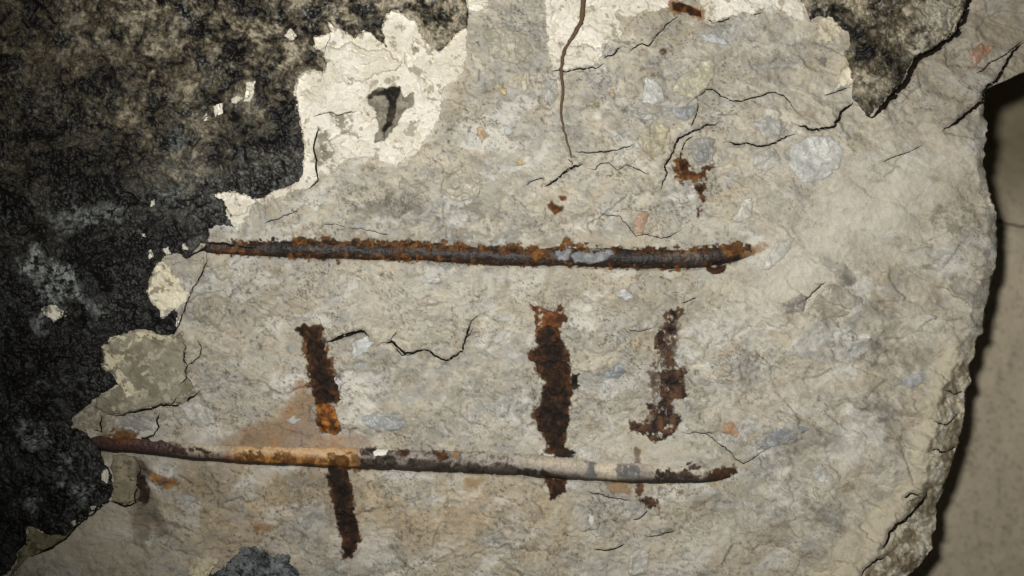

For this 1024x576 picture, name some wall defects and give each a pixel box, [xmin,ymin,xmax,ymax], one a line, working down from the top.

peeling [256,10,468,204]
crack [527,0,972,189]
crack [943,40,1024,131]
rust [672,153,714,217]
spalling [788,135,843,183]
water stain [50,204,120,231]
rust [214,236,752,274]
water stain [15,242,105,335]
peeling [146,262,189,319]
crack [327,315,479,361]
water stain [57,452,95,504]
rust [327,447,554,476]